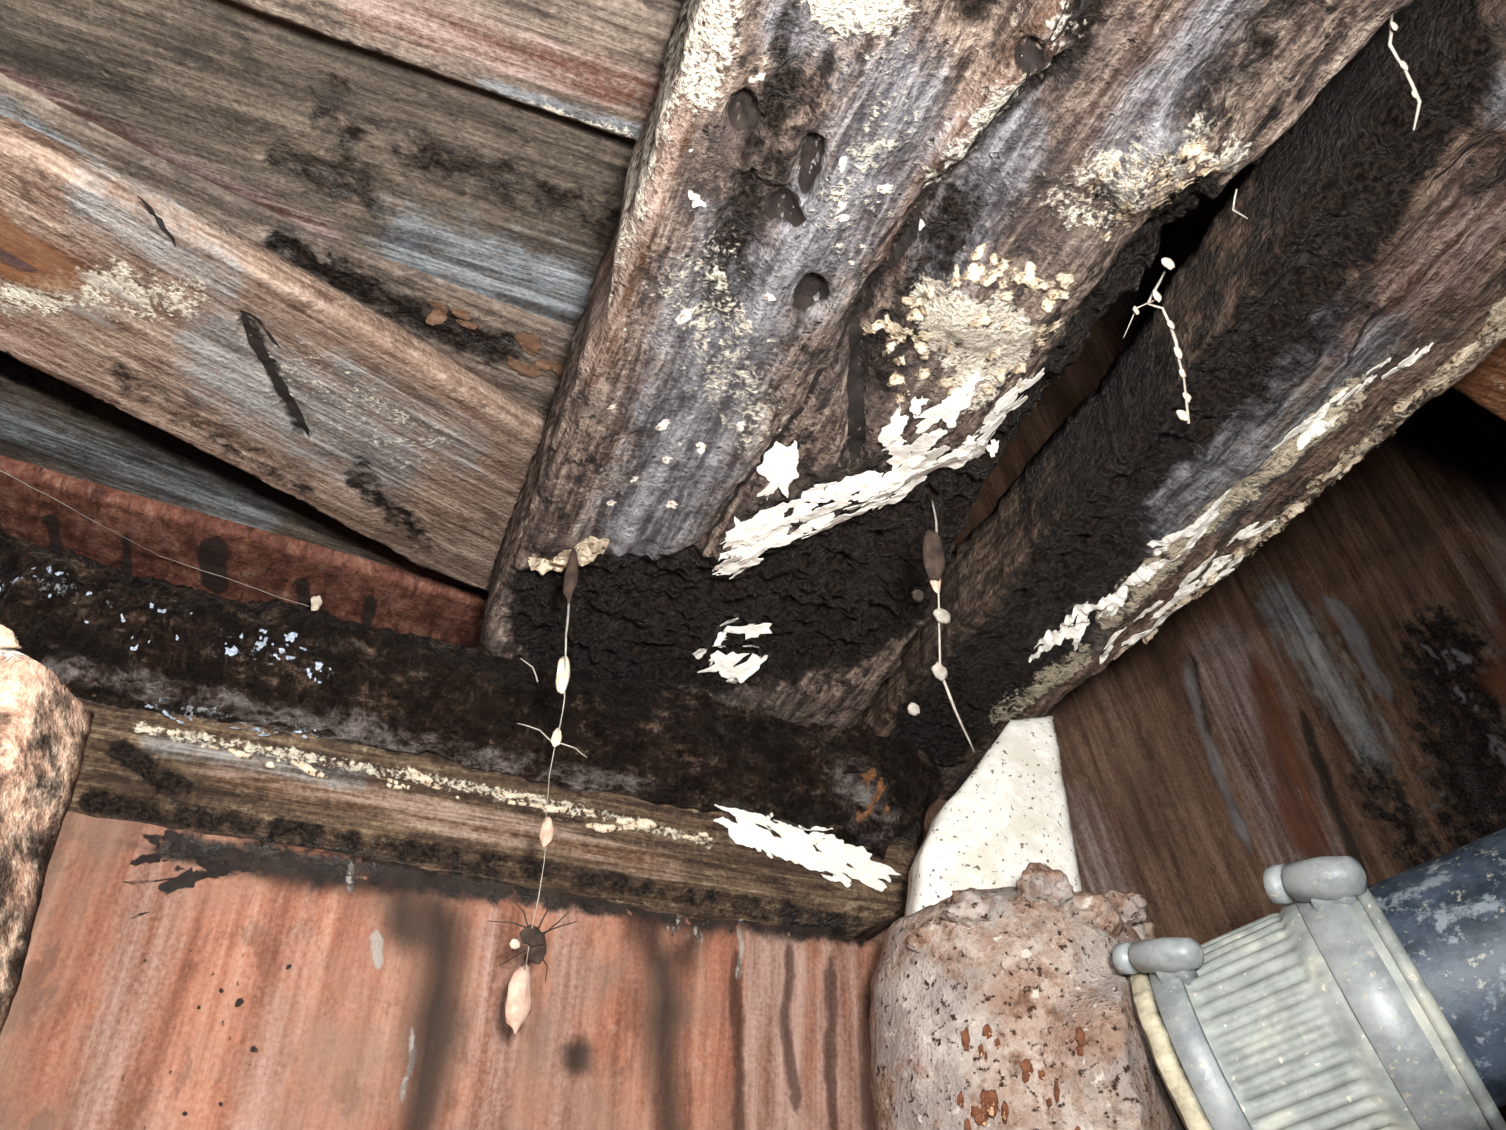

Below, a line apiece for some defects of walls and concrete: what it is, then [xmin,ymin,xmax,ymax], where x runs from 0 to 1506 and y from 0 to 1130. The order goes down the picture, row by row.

damp [1080,134,1234,241]
damp [862,243,1077,403]
damp [1271,343,1434,451]
peeling [712,368,1045,579]
peeling [911,529,946,601]
damp [1029,438,1370,664]
damp [225,629,331,684]
peeling [200,745,328,777]
peeling [381,765,459,799]
peeling [496,790,657,847]
peeling [682,804,901,892]
damp [222,853,825,1130]